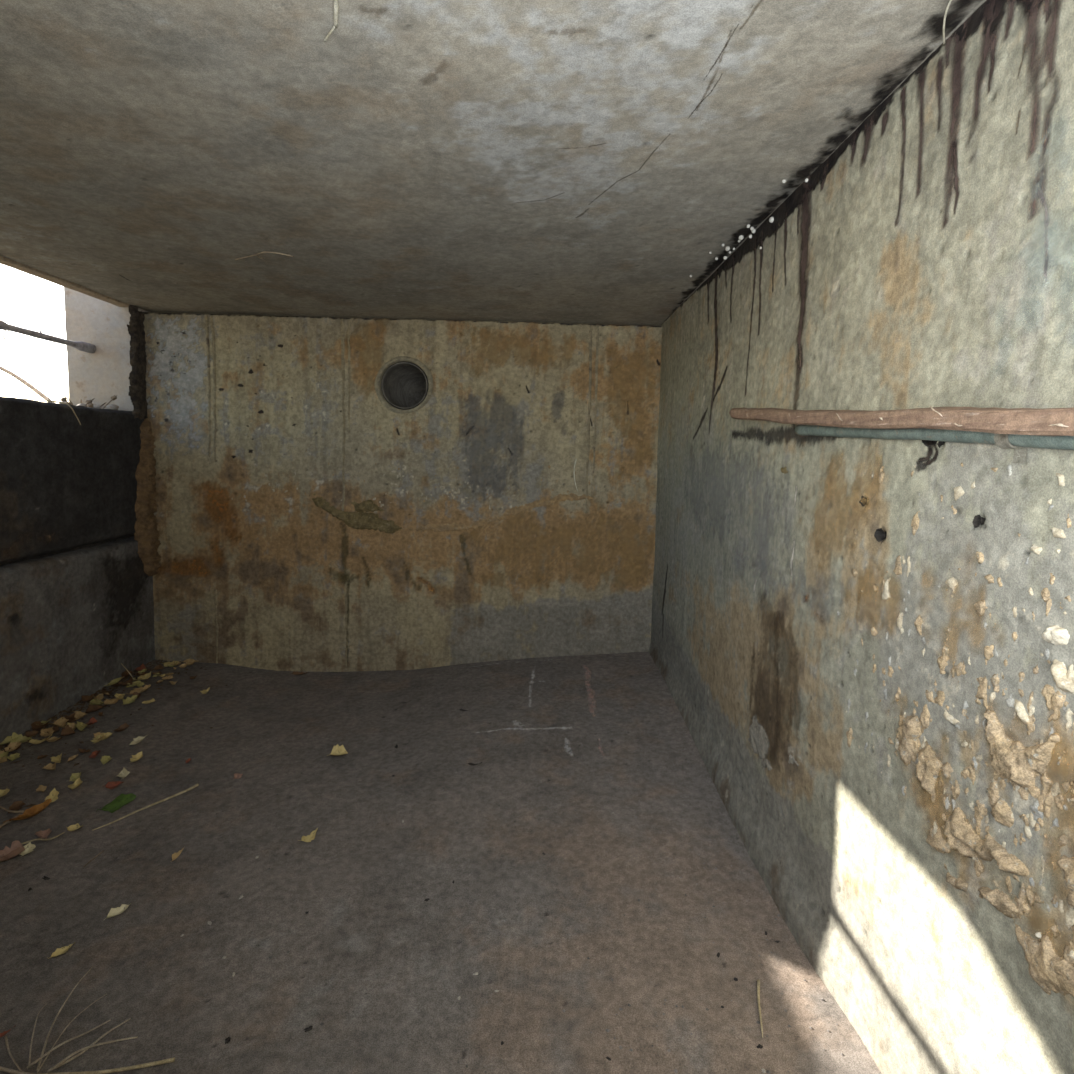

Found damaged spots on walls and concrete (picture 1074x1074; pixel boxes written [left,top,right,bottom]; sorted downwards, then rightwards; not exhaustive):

crack [689,0,762,117]
crack [576,134,670,218]
damp [673,0,1060,433]
spalling [232,459,525,534]
peeling [940,481,975,519]
peeling [1051,513,1072,554]
peeling [851,551,1074,966]